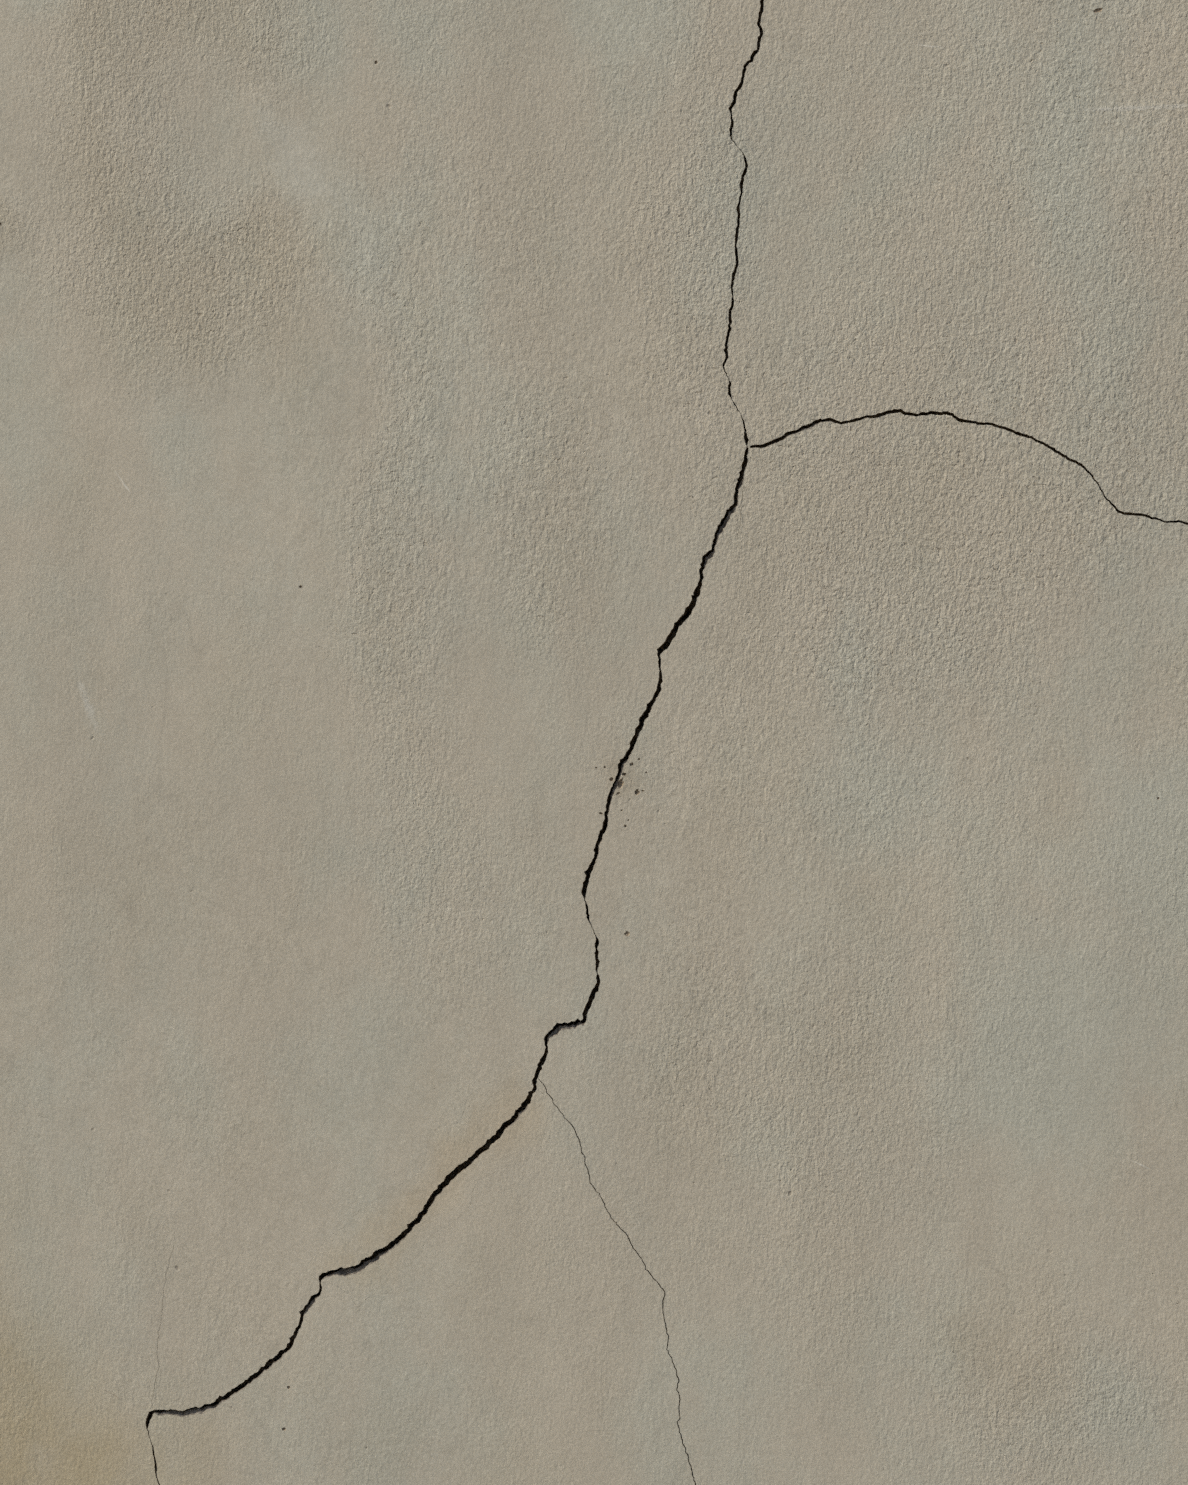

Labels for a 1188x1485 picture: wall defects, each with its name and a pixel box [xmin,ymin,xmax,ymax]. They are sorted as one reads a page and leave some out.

crack [728,0,764,147]
crack [146,151,1188,1485]